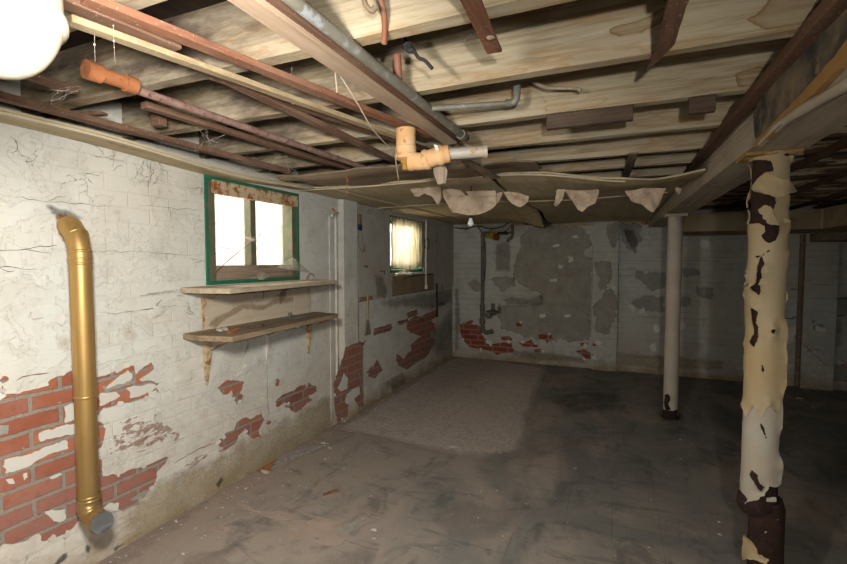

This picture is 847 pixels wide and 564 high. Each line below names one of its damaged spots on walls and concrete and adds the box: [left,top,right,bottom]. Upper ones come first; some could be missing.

crack [0,245,55,272]
peeling [460,225,618,361]
peeling [628,271,666,312]
peeling [333,310,436,420]
peeling [217,380,244,404]
peeling [272,378,317,413]
peeling [97,362,168,512]
leakage [114,419,178,451]
peeling [215,413,274,452]
peeling [0,371,79,546]